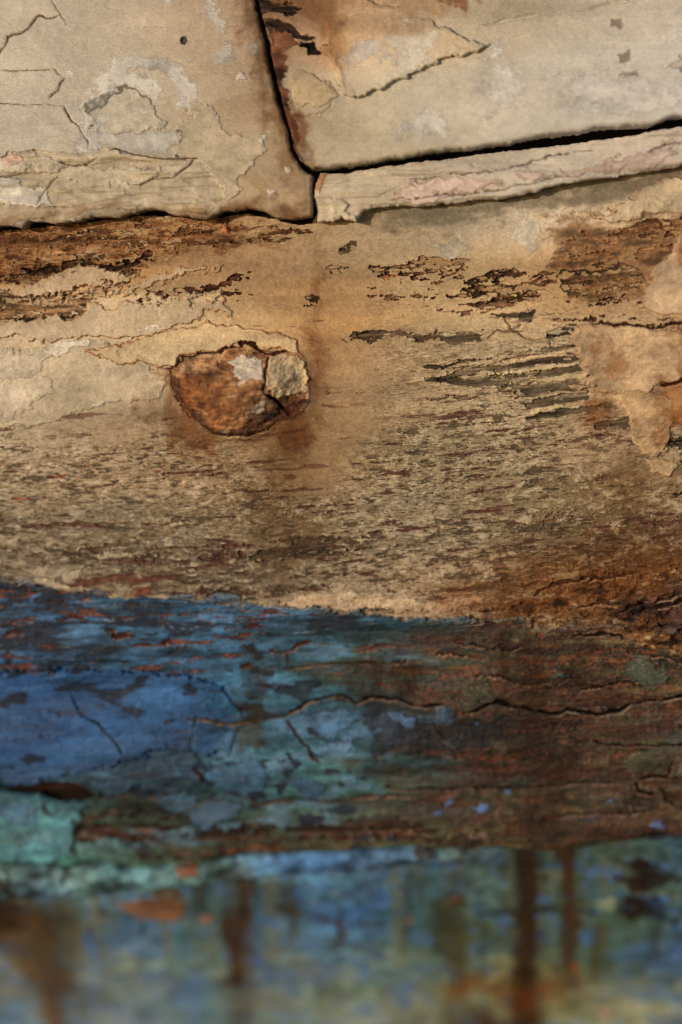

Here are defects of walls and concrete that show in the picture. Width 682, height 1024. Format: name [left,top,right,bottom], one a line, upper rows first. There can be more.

crack [0,0,197,205]
peeling [566,50,682,120]
crack [403,150,593,200]
peeling [0,55,313,429]
peeling [326,241,357,274]
peeling [343,138,682,477]
crack [109,633,174,648]
crack [239,623,408,670]
crack [480,572,682,665]
crack [185,641,682,820]
peeling [0,666,516,923]
peeling [607,749,682,841]